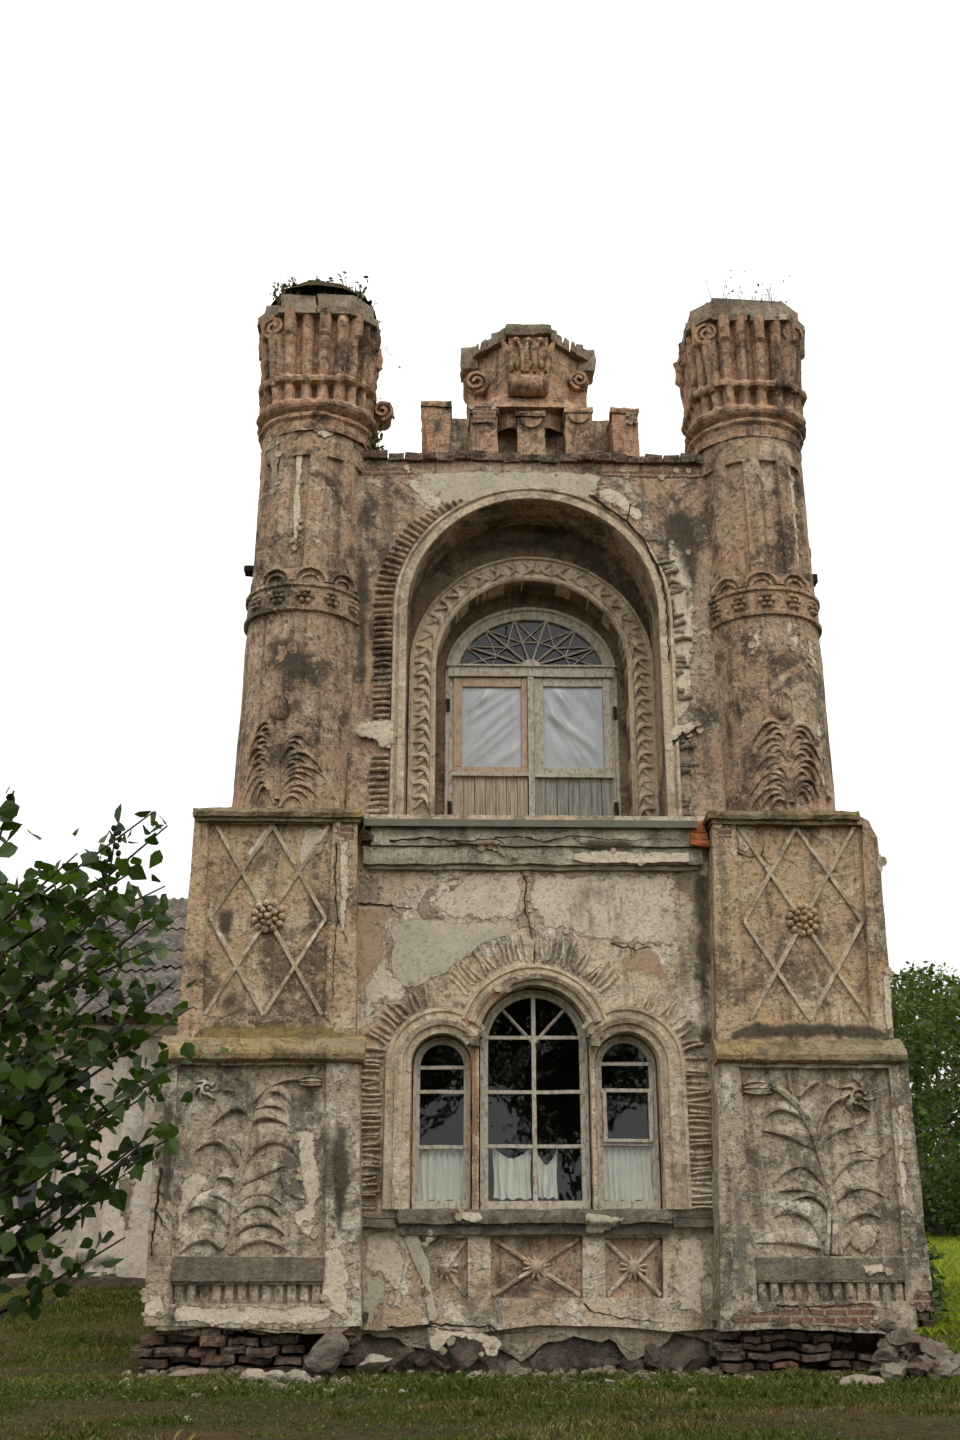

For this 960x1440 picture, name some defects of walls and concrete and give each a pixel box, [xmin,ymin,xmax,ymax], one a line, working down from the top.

crack [389,835,679,850]
peeling [299,822,690,1017]
crack [513,875,536,962]
peeling [34,1216,60,1277]
peeling [118,1175,136,1230]
peeling [139,1126,405,1329]
spalling [422,1229,438,1247]